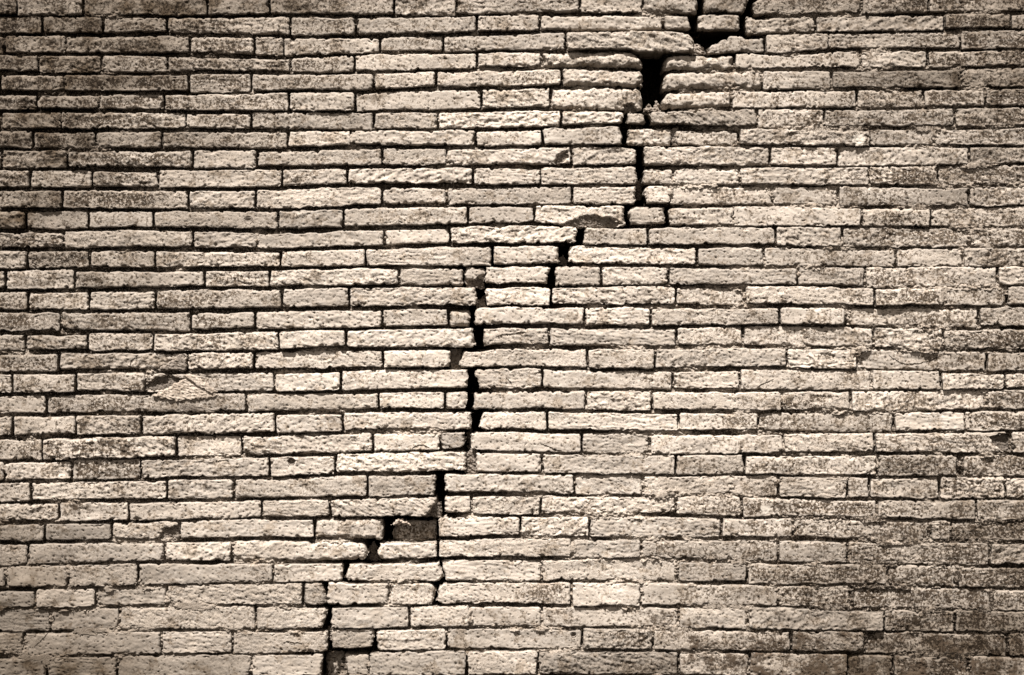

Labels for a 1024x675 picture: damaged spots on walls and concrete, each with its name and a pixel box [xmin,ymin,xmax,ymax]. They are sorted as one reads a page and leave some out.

crack [686,0,754,57]
crack [548,55,678,307]
crack [283,246,527,675]